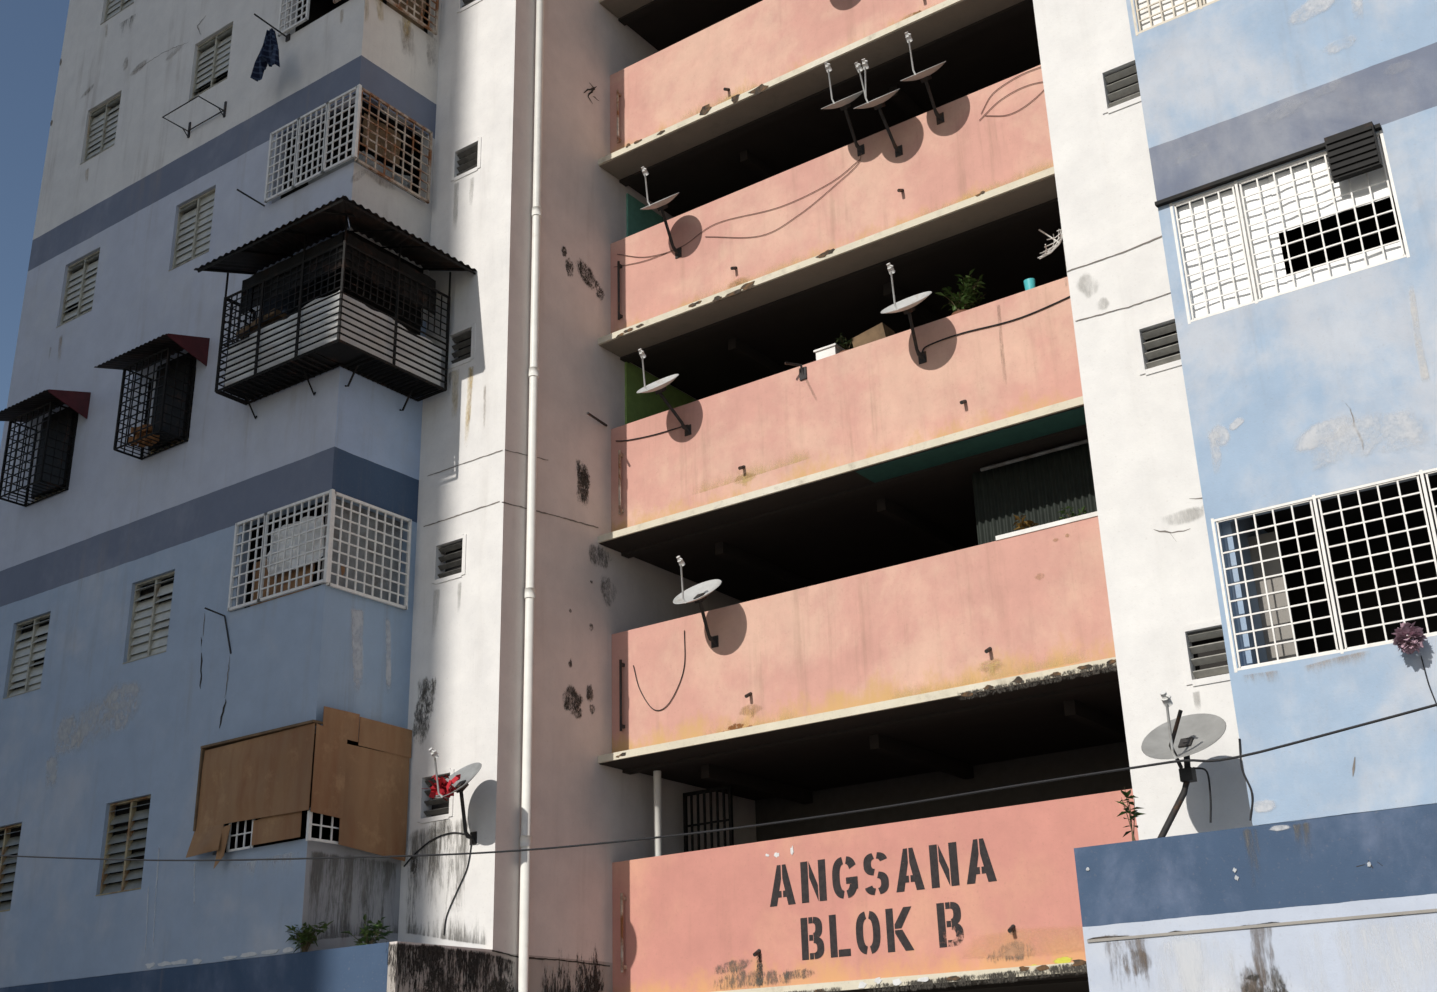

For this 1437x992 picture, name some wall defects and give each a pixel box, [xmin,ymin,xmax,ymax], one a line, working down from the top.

damp [577,462,590,504]
crack [199,613,230,728]
damp [413,679,434,741]
damp [563,685,595,718]
damp [310,820,515,992]
damp [542,954,604,992]
damp [717,953,840,992]
damp [871,930,1087,992]
damp [1126,939,1147,973]
damp [1241,928,1287,992]